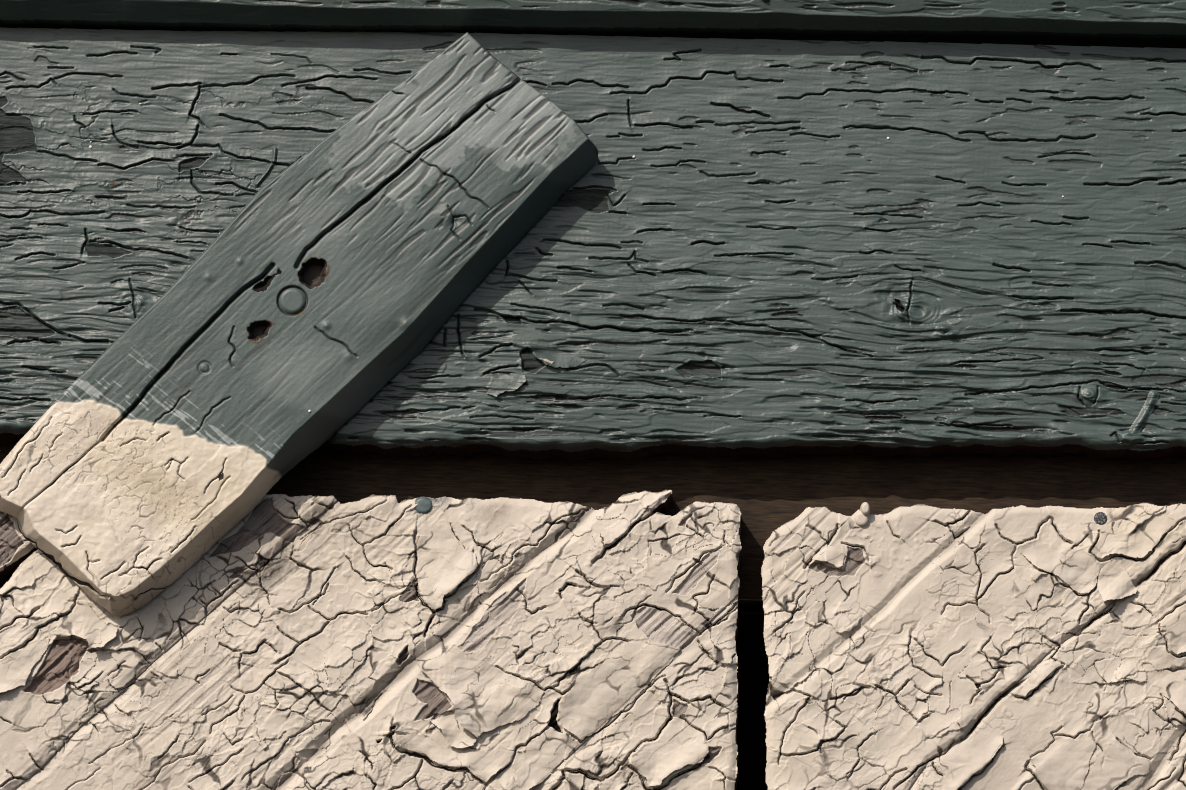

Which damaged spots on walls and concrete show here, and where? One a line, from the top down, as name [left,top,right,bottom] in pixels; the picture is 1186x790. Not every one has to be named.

peeling [0,97,37,185]
crack [0,47,410,269]
crack [398,50,1186,379]
crack [0,302,108,494]
crack [567,364,739,417]
crack [958,349,1184,405]
peeling [0,602,118,695]
crack [0,394,227,704]
crack [142,501,580,790]
peeling [377,579,698,790]
crack [501,511,735,695]
crack [552,677,725,790]